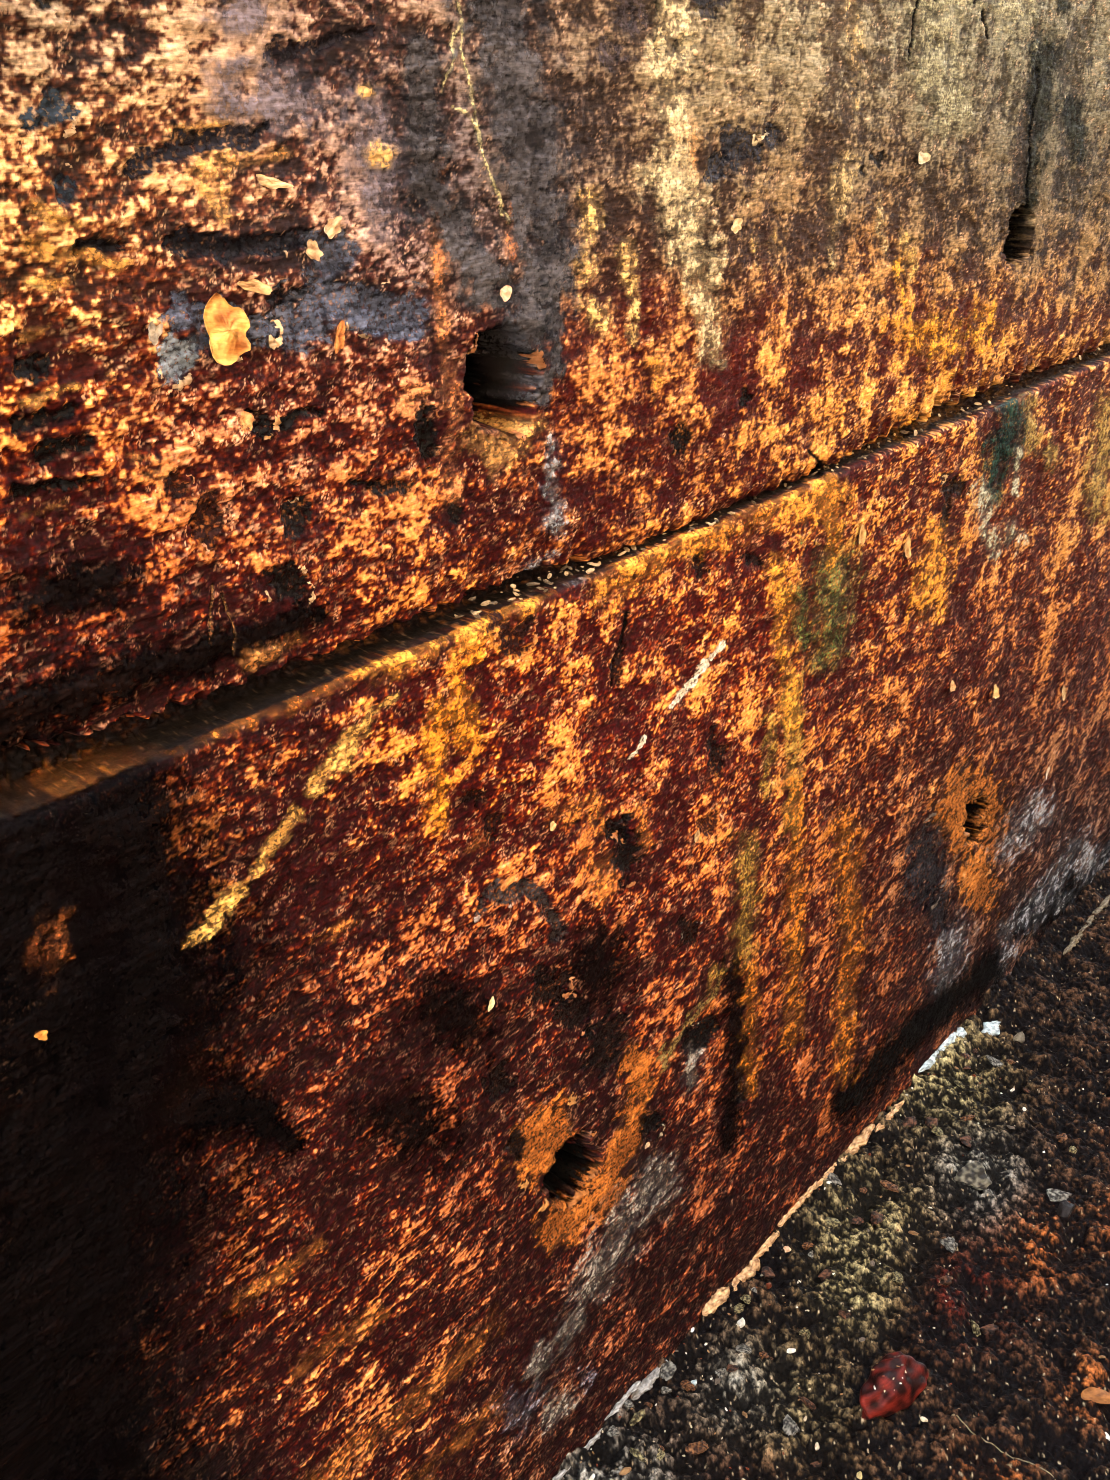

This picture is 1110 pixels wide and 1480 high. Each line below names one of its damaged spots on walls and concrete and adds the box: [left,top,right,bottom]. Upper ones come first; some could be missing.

rust [431,240,451,340]
peeling [519,349,546,370]
rust [590,474,854,614]
rust [909,518,963,620]
rust [762,554,803,734]
rust [275,597,553,832]
spalling [472,874,569,943]
rust [546,788,615,907]
rust [739,776,872,1098]
spalling [896,748,1016,939]
spalling [680,1011,720,1068]
spalling [481,964,666,1256]